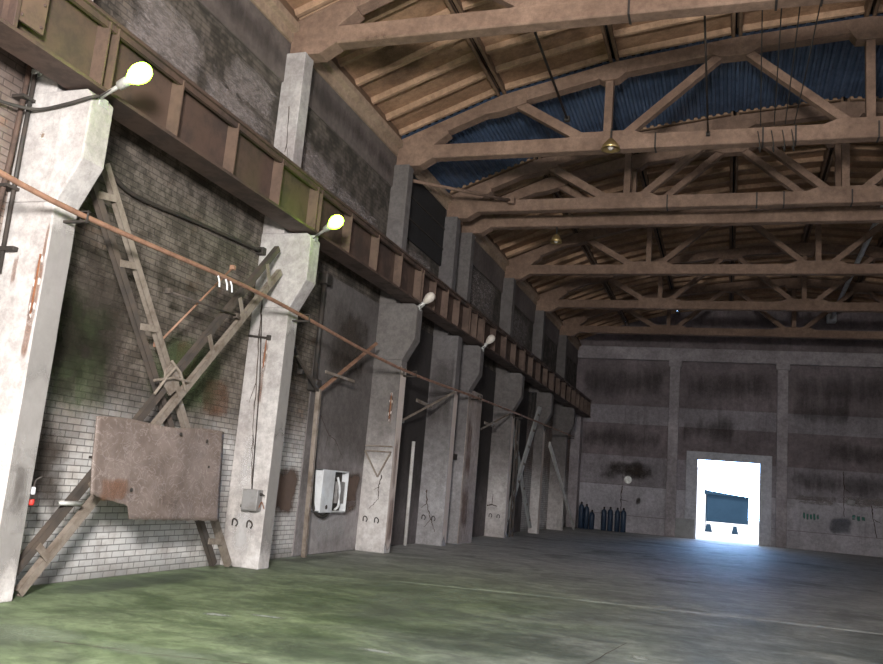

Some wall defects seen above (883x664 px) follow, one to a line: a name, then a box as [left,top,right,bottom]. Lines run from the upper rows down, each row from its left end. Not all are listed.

water stain [0,227,73,571]